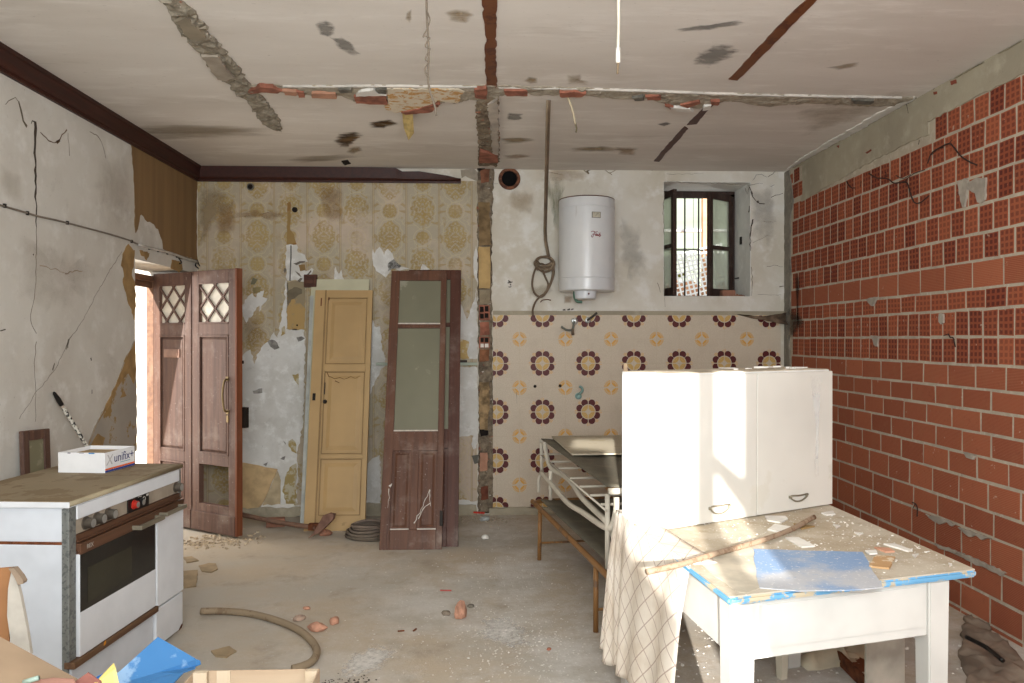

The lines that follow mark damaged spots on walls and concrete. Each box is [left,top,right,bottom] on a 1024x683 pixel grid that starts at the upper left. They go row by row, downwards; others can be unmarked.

spalling [356,88,387,97]
spalling [671,104,711,112]
crack [5,97,122,422]